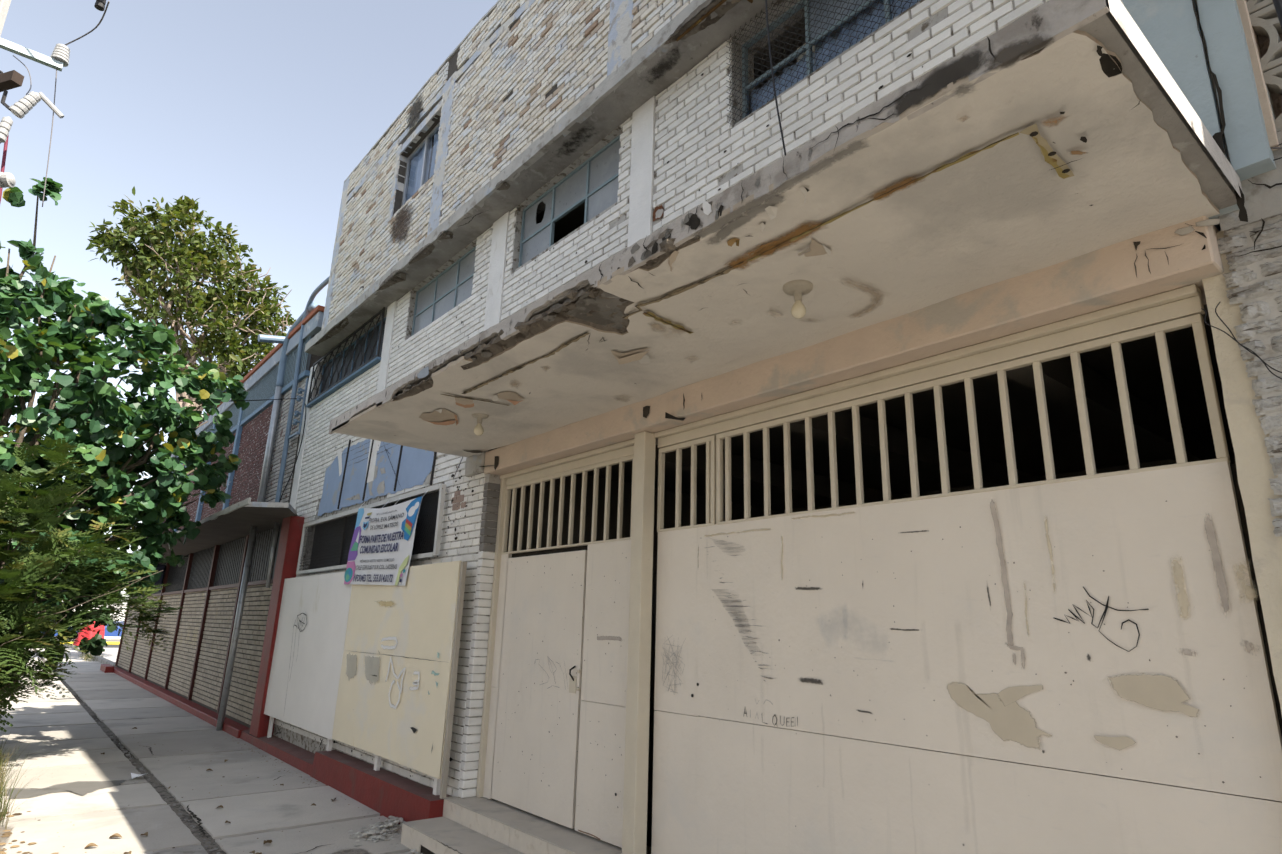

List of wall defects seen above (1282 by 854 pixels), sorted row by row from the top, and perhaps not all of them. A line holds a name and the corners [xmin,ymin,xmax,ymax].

corrosion [871,177,918,200]
leakage [390,206,411,243]
corrosion [727,222,822,269]
spalling [453,188,724,370]